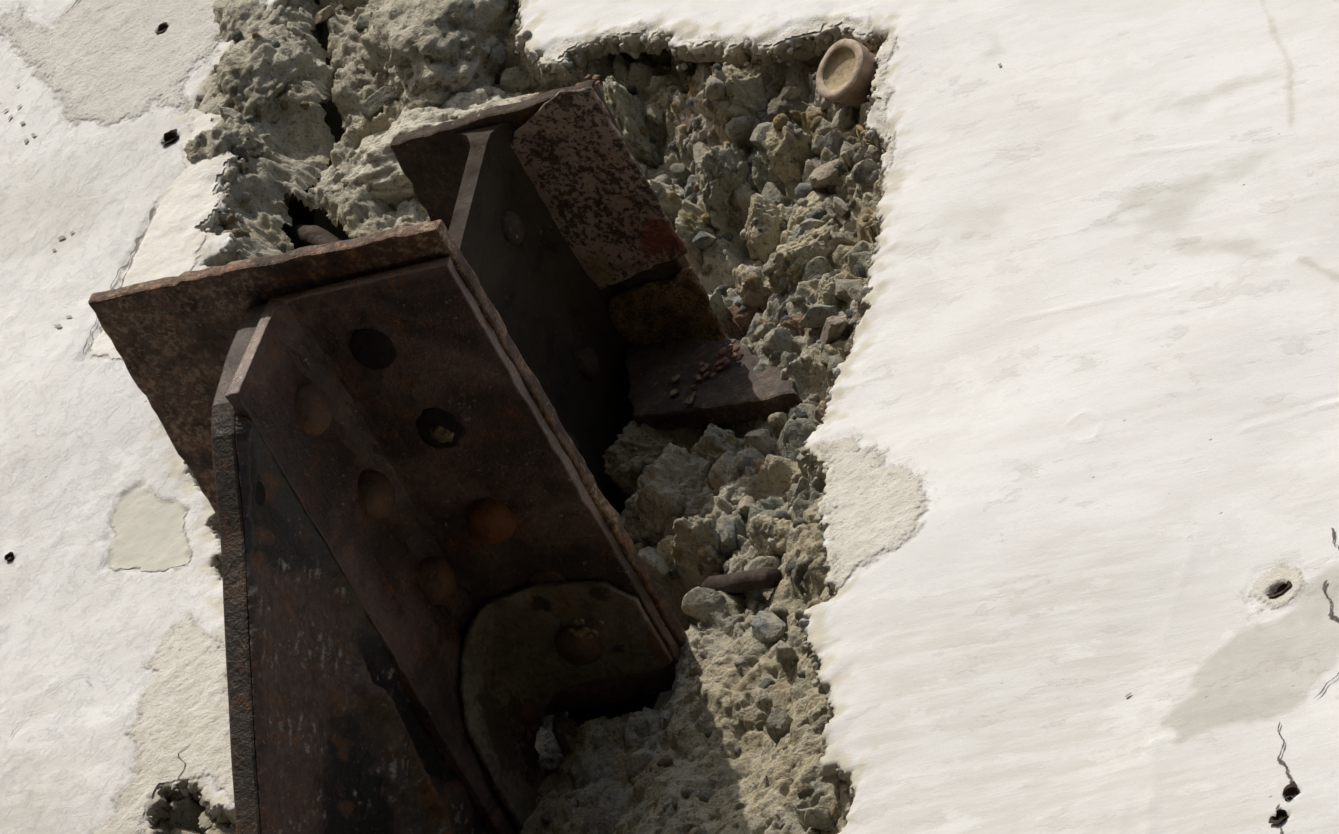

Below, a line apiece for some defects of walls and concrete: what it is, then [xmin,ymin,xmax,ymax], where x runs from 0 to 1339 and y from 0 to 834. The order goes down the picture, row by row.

spalling [0,0,930,834]
corrosion [669,339,741,405]
crack [1322,580,1339,621]
crack [1276,723,1293,834]